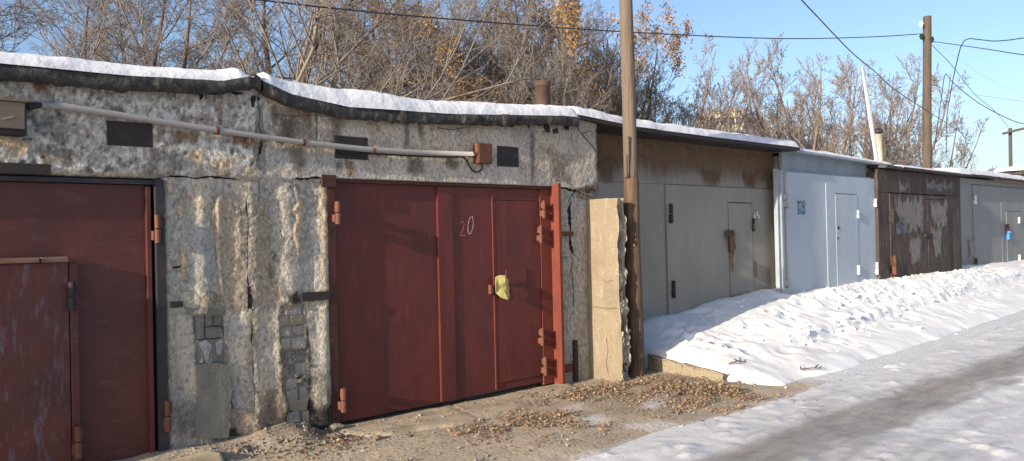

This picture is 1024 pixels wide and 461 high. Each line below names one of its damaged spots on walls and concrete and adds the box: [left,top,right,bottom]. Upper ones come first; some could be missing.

crack [167,102,323,410]
crack [561,187,614,309]
peeling [894,178,951,266]
water stain [173,313,198,394]
spalling [192,315,229,367]
spalling [276,292,313,426]